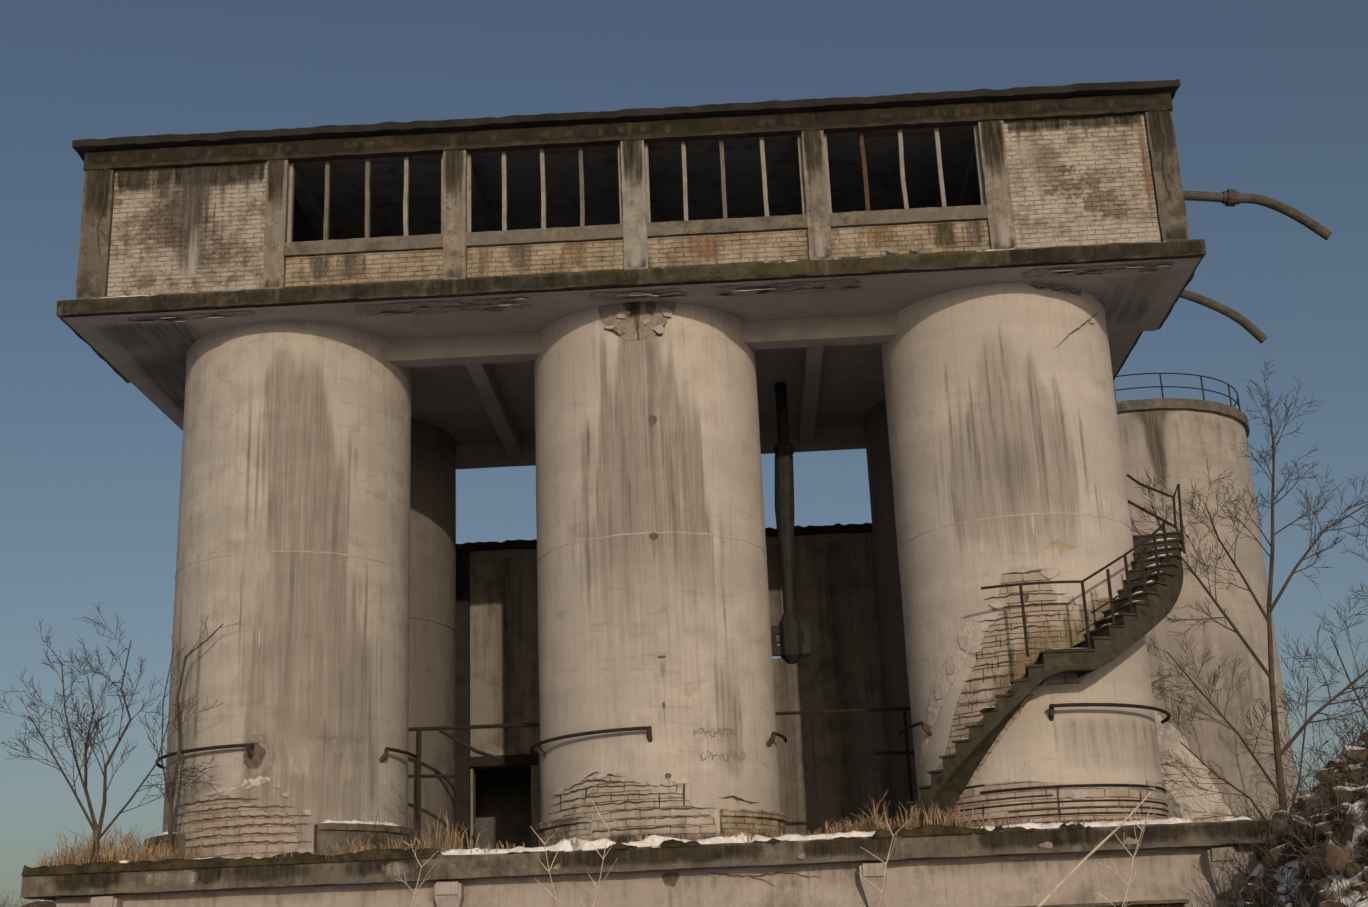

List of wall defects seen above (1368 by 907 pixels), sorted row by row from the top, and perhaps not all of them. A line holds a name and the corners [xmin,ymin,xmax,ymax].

damp [268,159,284,200]
spalling [598,301,676,341]
crack [1054,311,1099,349]
damp [1137,410,1166,481]
spalling [919,567,1234,846]
spalling [166,734,311,859]
spalling [548,772,717,842]